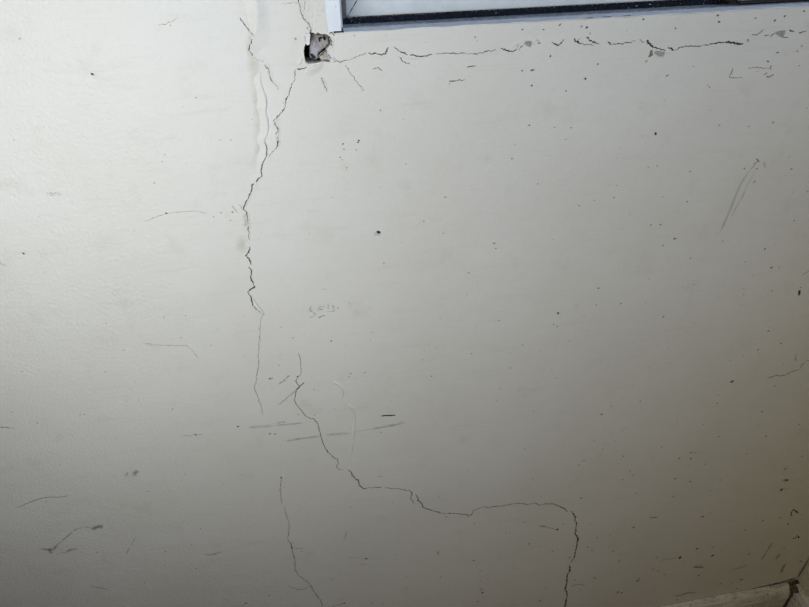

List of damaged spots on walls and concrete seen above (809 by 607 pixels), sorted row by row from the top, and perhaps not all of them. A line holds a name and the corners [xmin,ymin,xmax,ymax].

crack [282,0,328,34]
spalling [297,27,336,92]
crack [335,30,806,85]
crack [232,70,296,413]
crack [280,477,323,607]
crack [294,353,582,607]